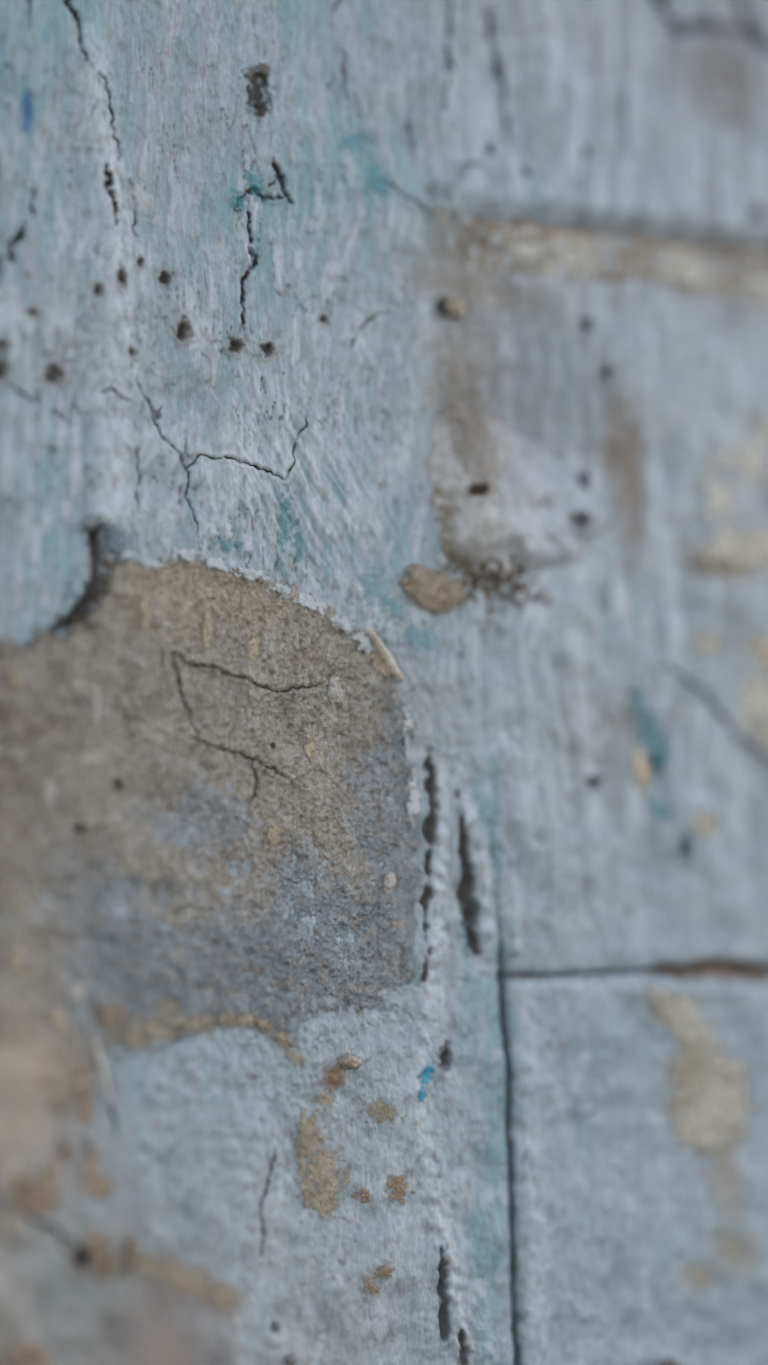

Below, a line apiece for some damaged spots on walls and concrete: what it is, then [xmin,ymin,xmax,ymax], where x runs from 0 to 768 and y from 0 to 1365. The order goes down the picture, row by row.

crack [64,0,136,235]
crack [0,191,35,263]
crack [233,158,293,324]
crack [105,379,308,534]
crack [172,653,321,799]
flaking render [0,545,424,1112]